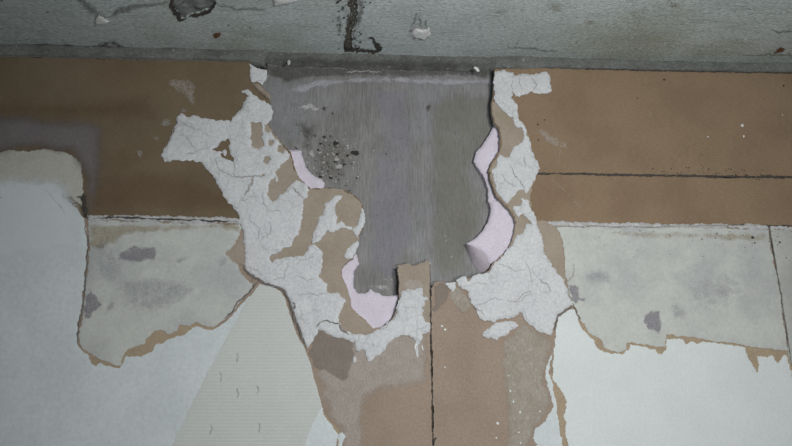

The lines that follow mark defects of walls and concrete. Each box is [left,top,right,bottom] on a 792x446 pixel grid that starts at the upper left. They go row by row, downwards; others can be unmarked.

crack [79,0,166,25]
crack [336,0,383,54]
flaking render [161,64,431,363]
flaking render [446,70,573,340]